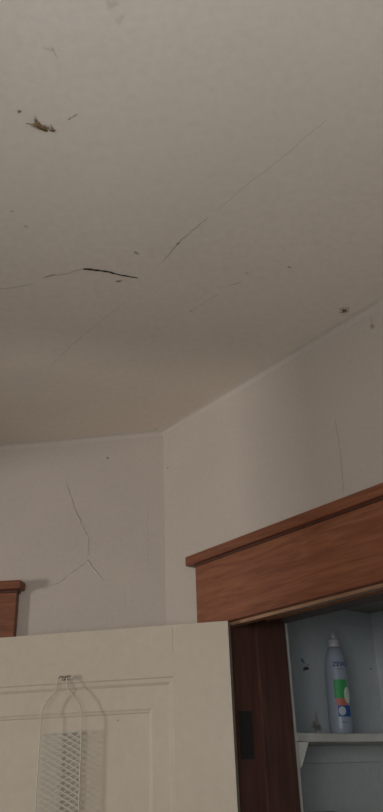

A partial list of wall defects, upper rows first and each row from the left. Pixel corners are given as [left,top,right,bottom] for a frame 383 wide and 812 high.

crack [83,268,137,278]